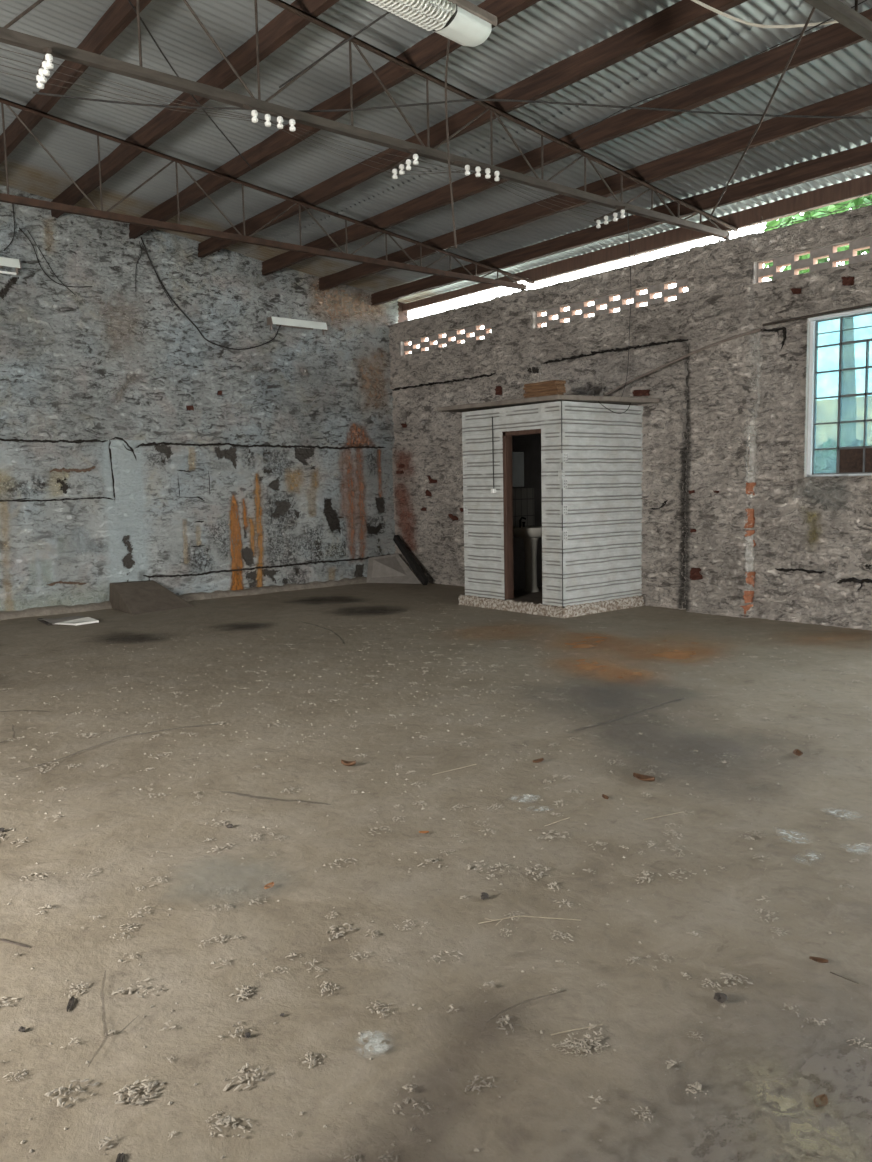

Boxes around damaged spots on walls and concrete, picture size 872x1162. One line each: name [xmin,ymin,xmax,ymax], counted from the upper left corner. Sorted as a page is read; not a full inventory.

flaking render [149,444,173,466]
crack [0,437,390,580]
corrosion [229,474,263,590]
peeling [188,446,347,588]
flaking render [366,497,386,536]
flaking render [740,429,756,617]
crack [47,579,86,587]
flaking render [122,535,137,582]
crack [775,568,872,590]